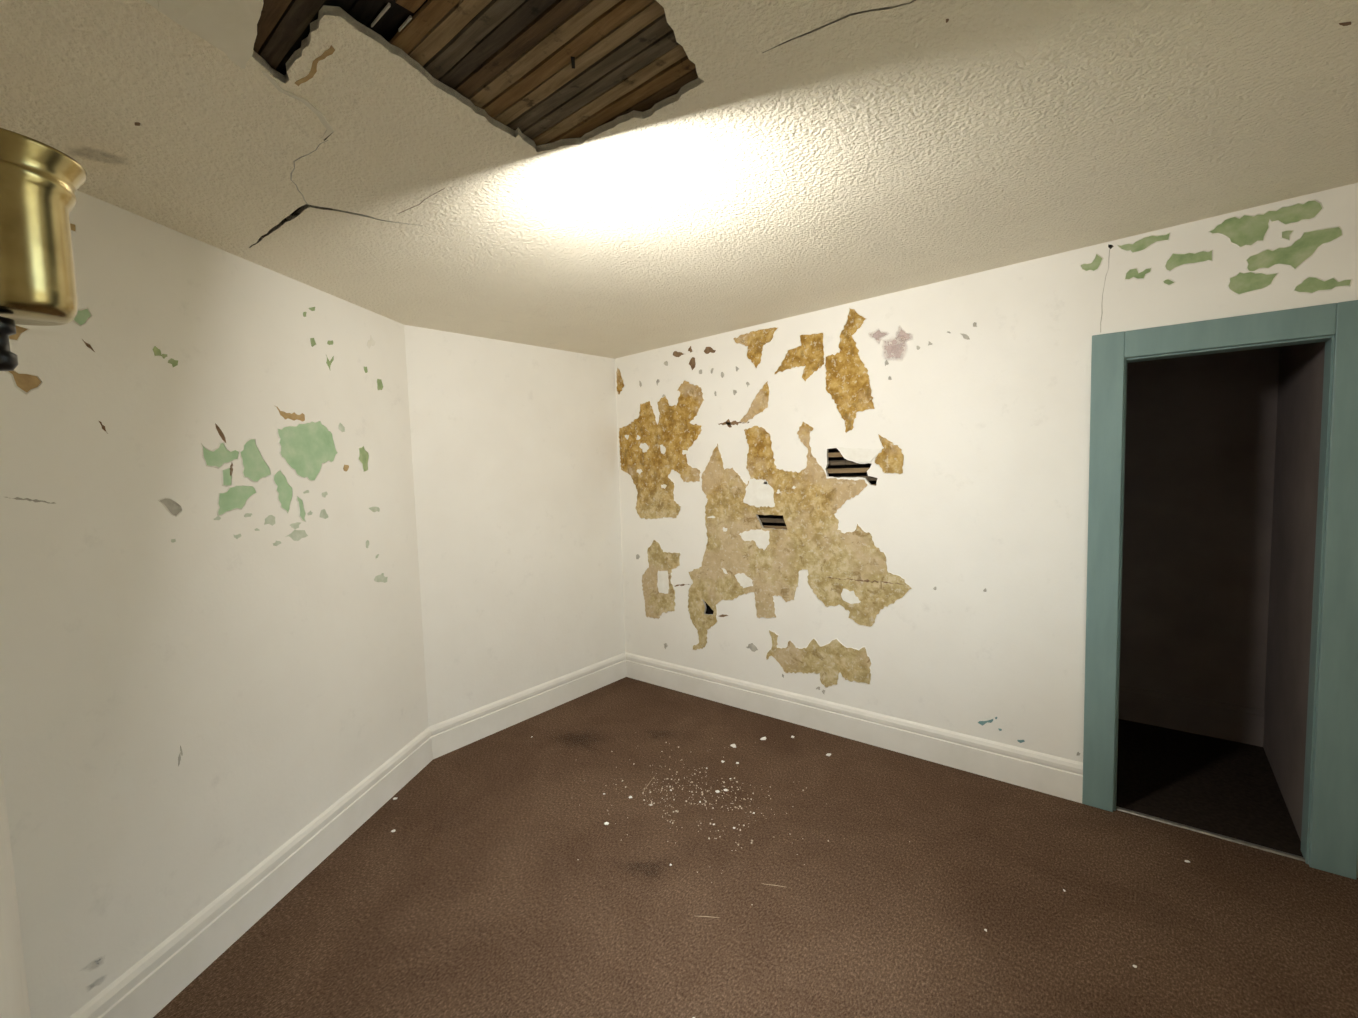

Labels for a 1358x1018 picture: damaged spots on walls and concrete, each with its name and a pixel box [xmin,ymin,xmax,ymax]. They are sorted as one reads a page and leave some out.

flaking render [252,5,702,152]
crack [765,0,916,52]
peeling [1079,199,1353,296]
peeling [201,406,369,546]
peeling [616,307,913,694]